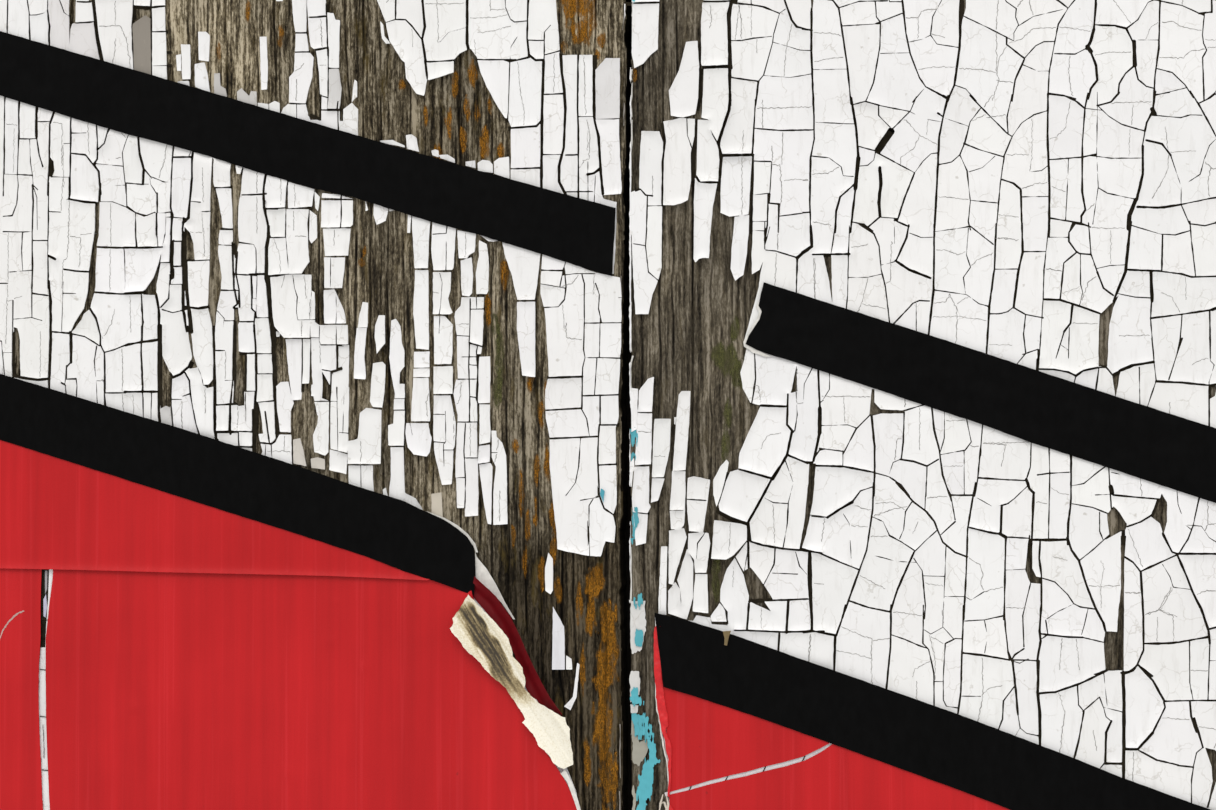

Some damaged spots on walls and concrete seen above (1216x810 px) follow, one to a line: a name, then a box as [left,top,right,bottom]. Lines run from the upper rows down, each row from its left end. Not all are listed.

peeling [69,0,92,32]
peeling [135,9,150,22]
peeling [165,0,321,121]
peeling [70,201,101,332]
peeling [144,256,175,295]
peeling [186,230,195,259]
peeling [208,158,243,326]
peeling [162,357,172,407]
peeling [233,0,772,810]
crack [629,349,1216,810]